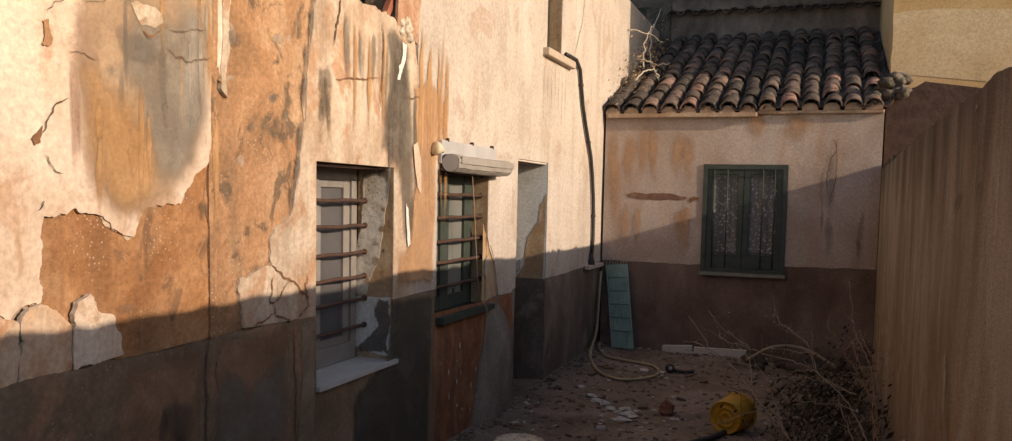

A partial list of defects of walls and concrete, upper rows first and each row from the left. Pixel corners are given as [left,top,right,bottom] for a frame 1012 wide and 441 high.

crack [41,99,67,174]
leakage [71,0,211,208]
peeling [113,359,199,441]
flaking render [0,0,313,388]
crack [248,265,310,441]
flaking render [356,167,390,356]
leakage [345,18,449,234]
flaking render [413,142,421,193]